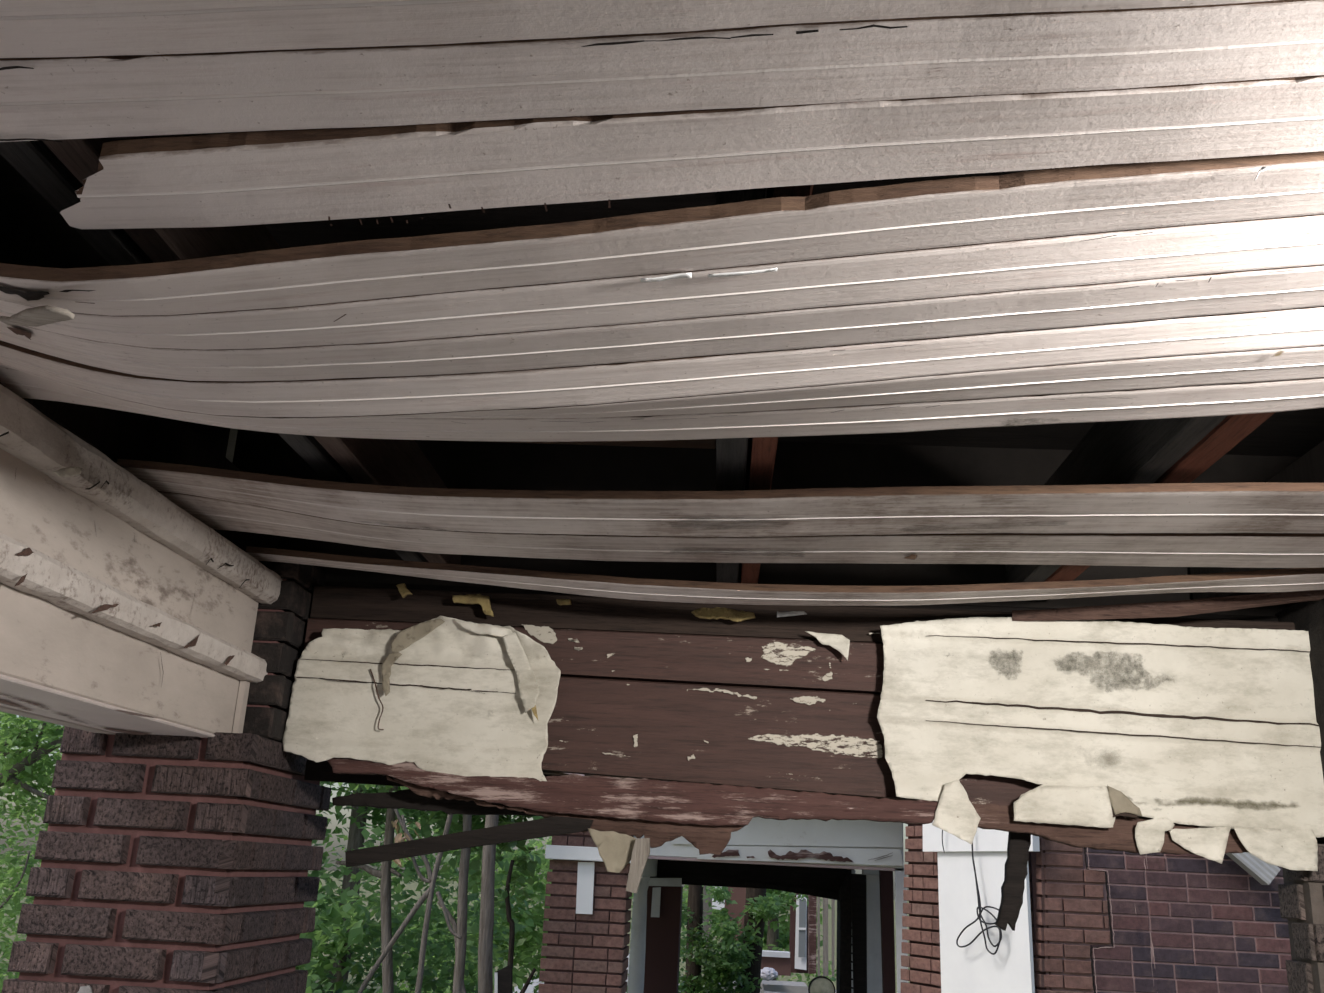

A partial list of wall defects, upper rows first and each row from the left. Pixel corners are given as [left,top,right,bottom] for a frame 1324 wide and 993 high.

peeling [7,327,32,340]
peeling [745,631,850,681]
water stain [1059,653,1144,687]
peeling [687,688,757,700]
peeling [792,696,830,711]
peeling [748,733,883,759]
peeling [712,849,853,862]